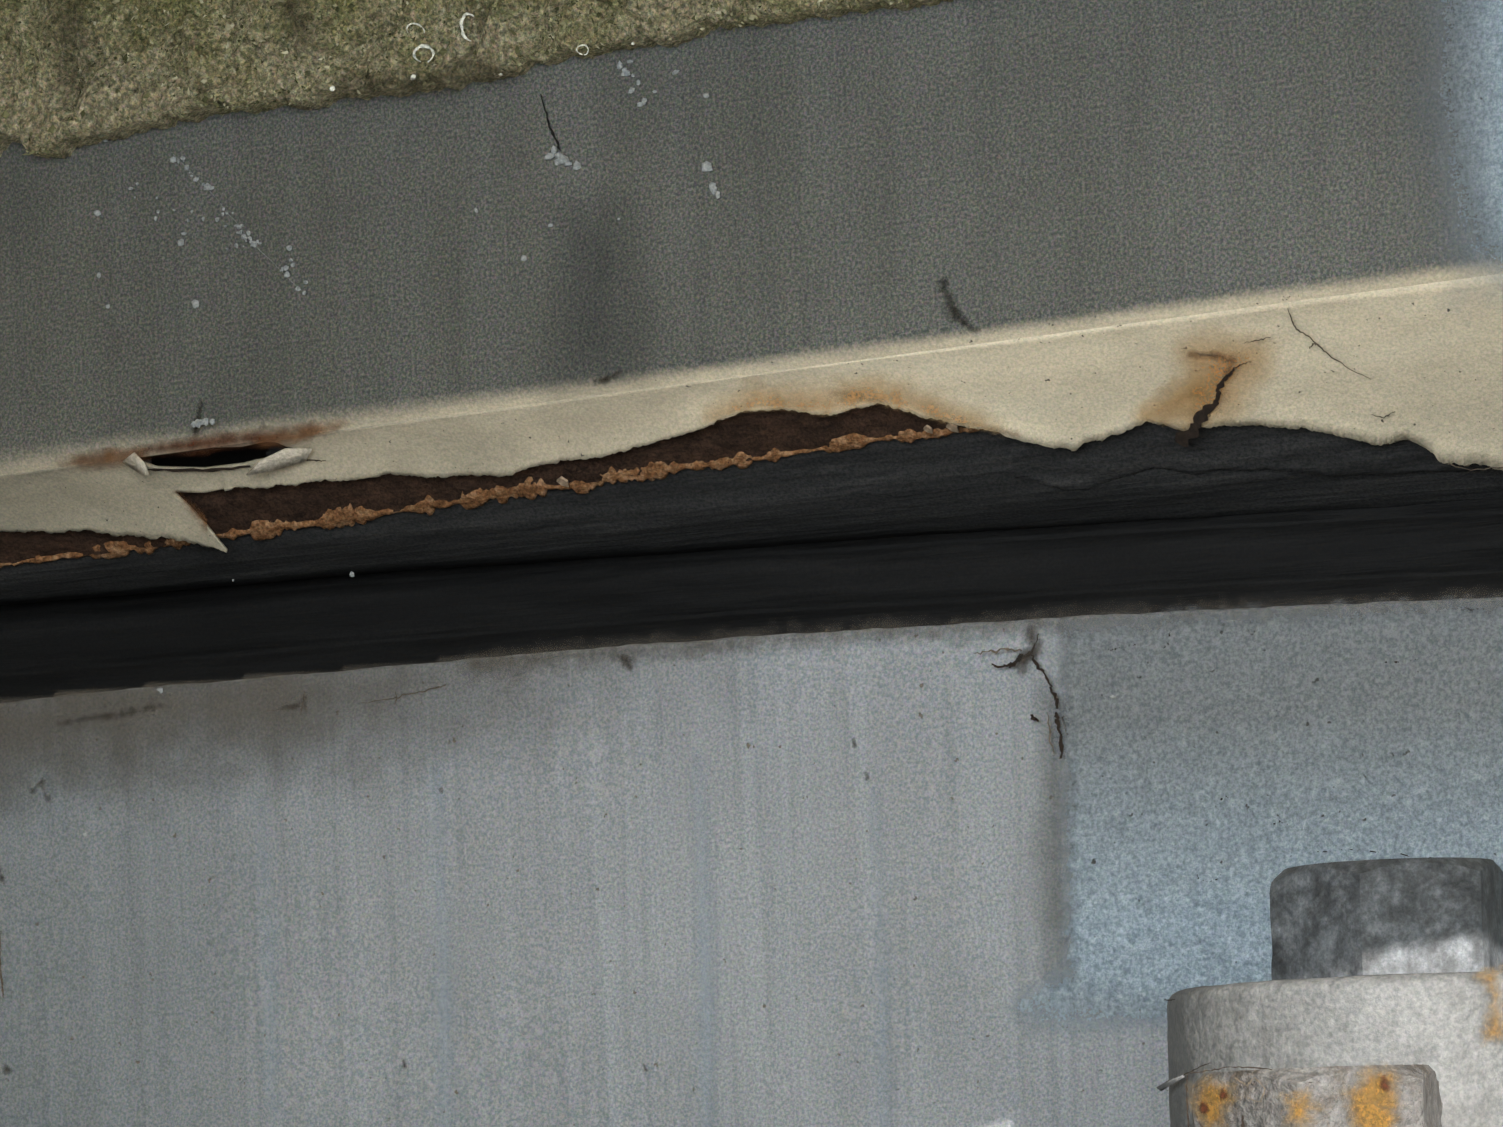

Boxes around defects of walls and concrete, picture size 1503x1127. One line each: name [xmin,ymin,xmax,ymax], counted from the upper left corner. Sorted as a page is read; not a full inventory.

crack [1288,310,1370,379]
rust [729,387,972,423]
crack [1150,353,1249,447]
peeling [177,403,982,541]
peeling [1010,421,1495,490]
peeling [0,530,191,568]
crack [974,628,1066,759]